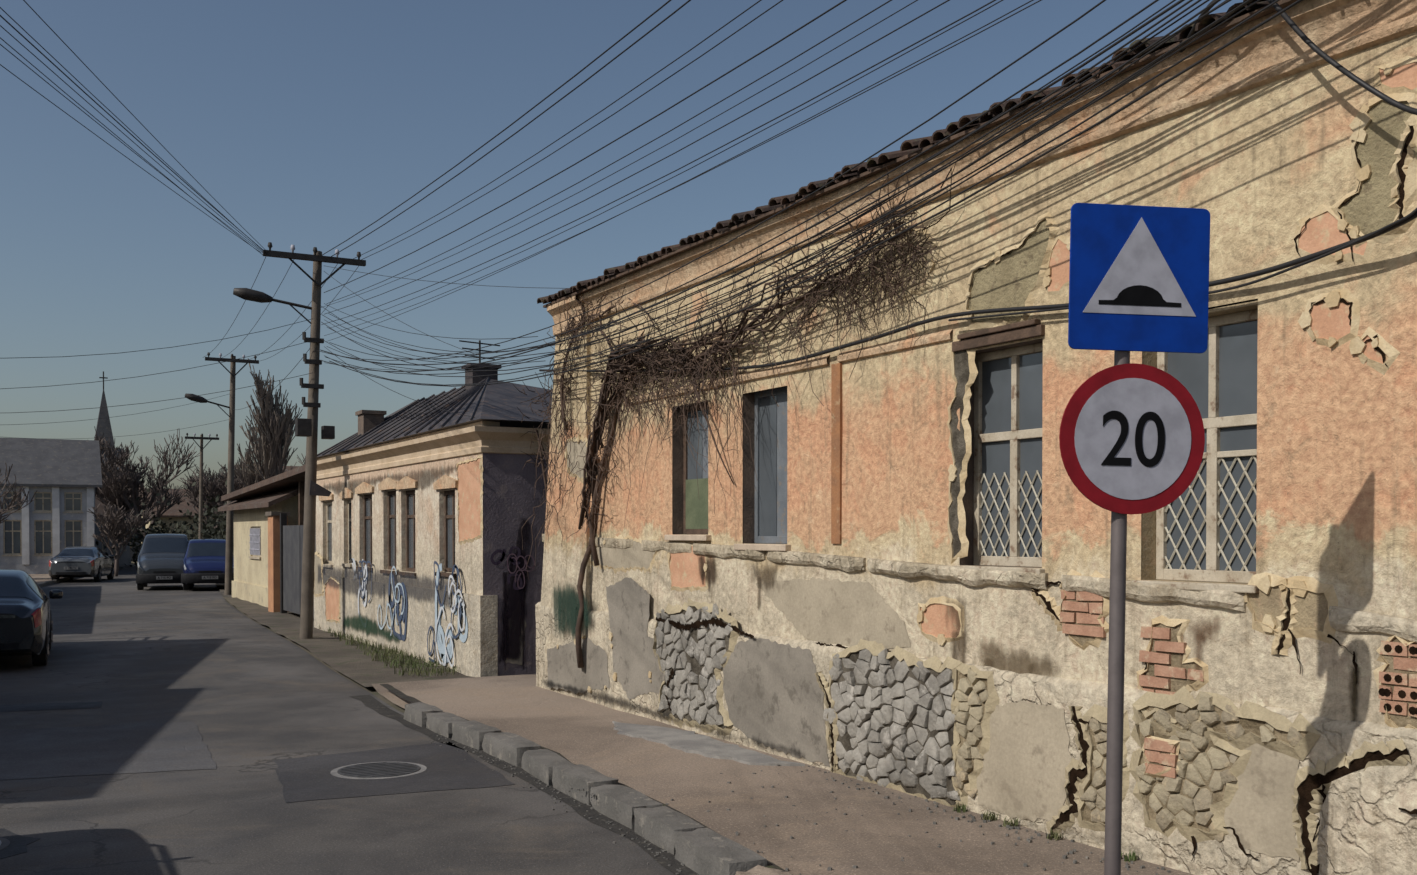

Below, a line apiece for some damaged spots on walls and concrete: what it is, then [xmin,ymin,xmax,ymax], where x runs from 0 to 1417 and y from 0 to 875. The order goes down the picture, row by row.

flaking render [1294,56,1417,265]
flaking render [964,211,1070,329]
flaking render [1298,289,1400,375]
flaking render [547,535,733,725]
flaking render [823,648,989,801]
crack [1046,706,1106,835]
flaking render [1123,615,1238,842]
crack [1191,827,1259,861]
crack [1271,587,1358,685]
crack [1291,738,1412,875]
flaking render [1373,635,1417,729]
crack [1398,807,1417,815]